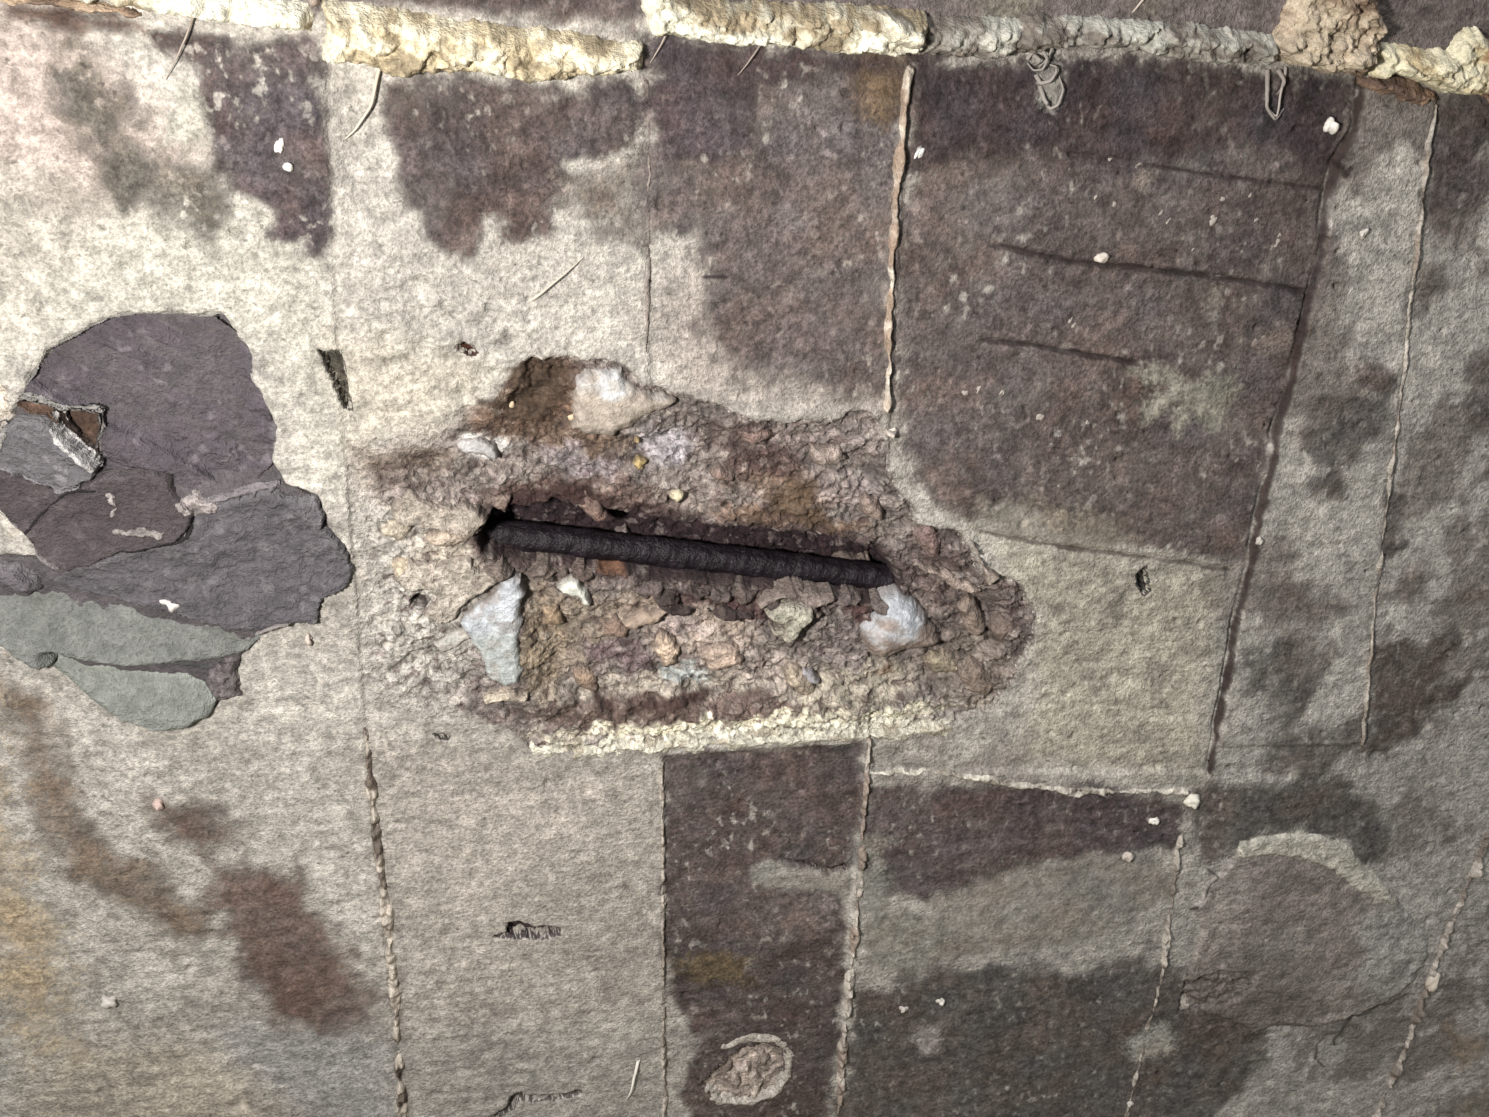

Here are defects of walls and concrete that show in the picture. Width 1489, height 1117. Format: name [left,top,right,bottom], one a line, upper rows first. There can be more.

damp [8,6,334,258]
spalling [0,354,1037,759]
damp [382,0,1355,564]
damp [1301,362,1397,499]
damp [1381,489,1407,559]
damp [1464,353,1489,434]
damp [0,687,374,1034]
damp [658,632,1472,1117]